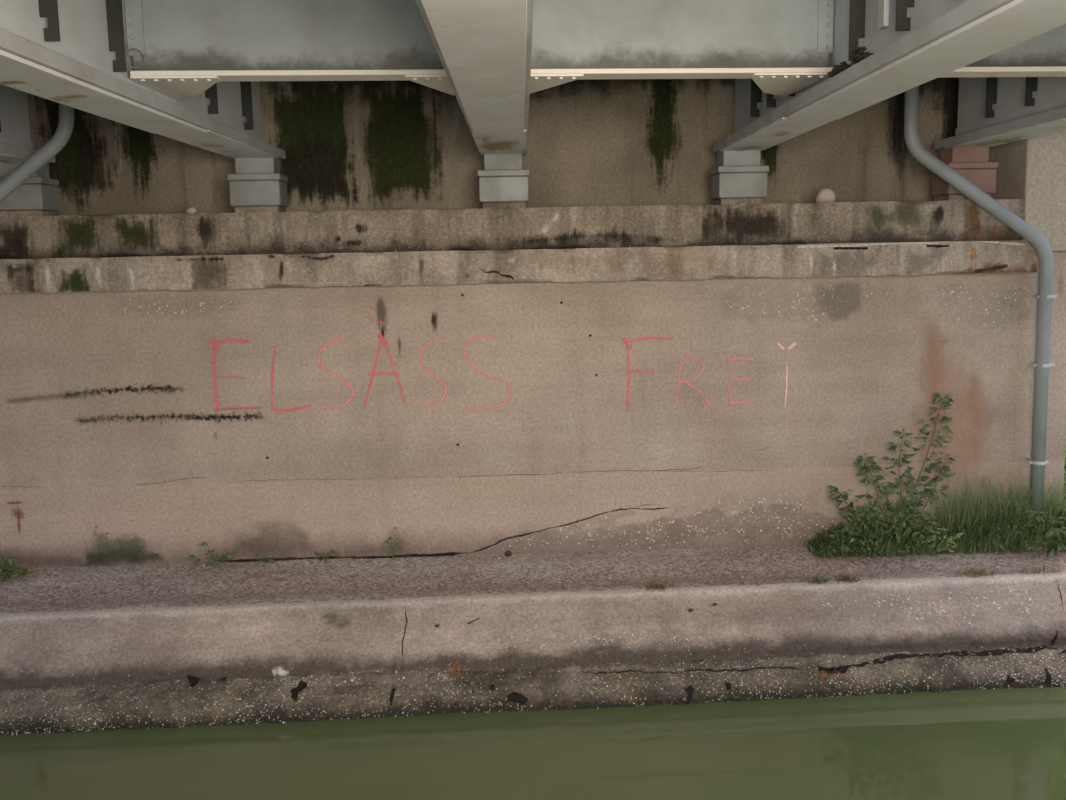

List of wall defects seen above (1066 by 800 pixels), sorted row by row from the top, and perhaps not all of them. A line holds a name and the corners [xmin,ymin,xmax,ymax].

damp [268,80,423,204]
damp [532,79,684,181]
damp [336,224,367,246]
damp [702,206,790,244]
crack [498,446,773,476]
crack [222,504,675,562]
crack [400,606,408,673]